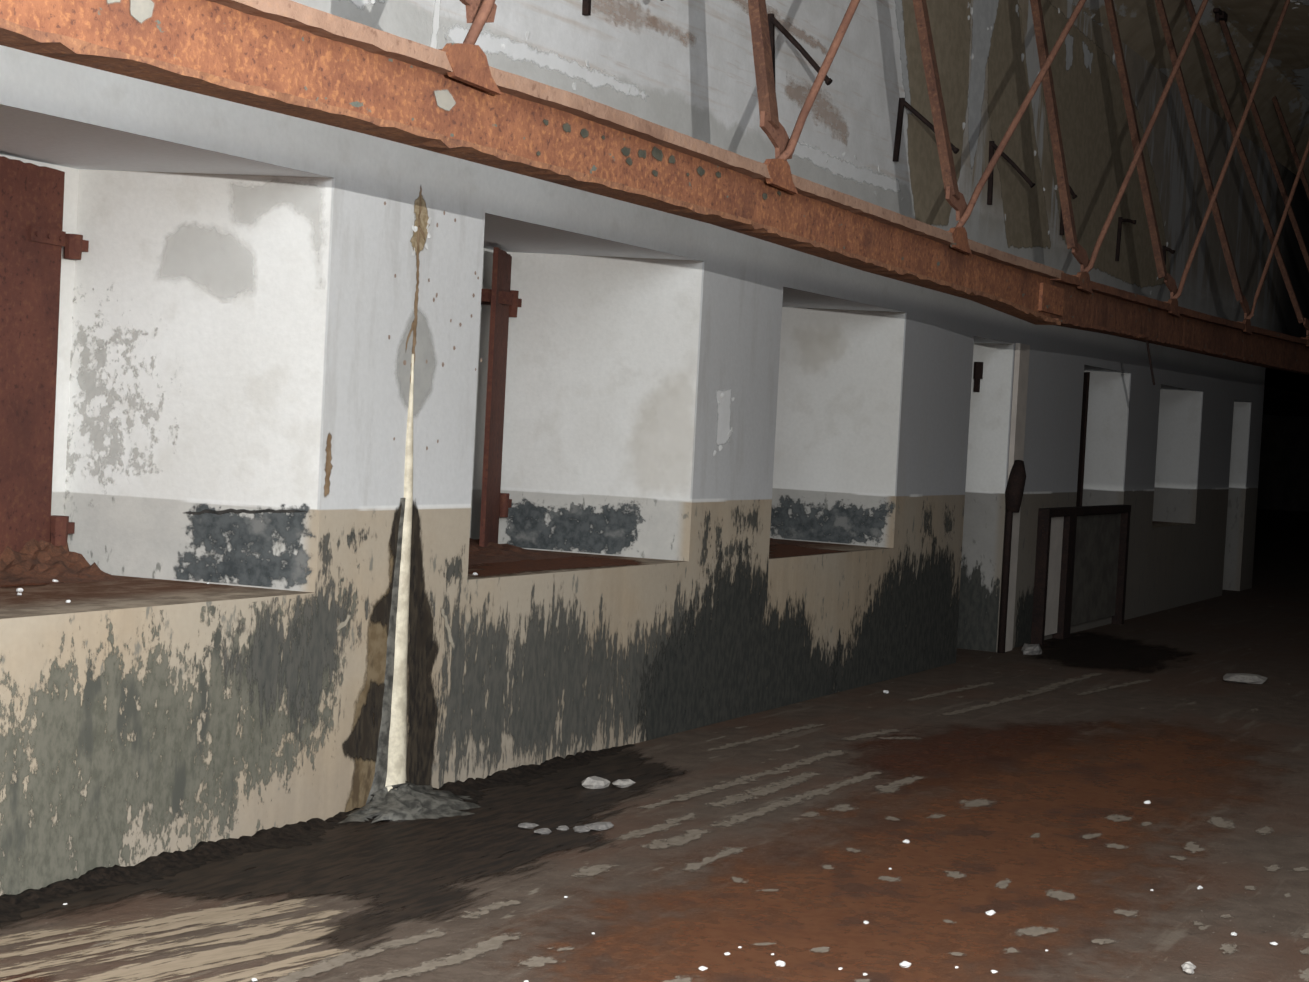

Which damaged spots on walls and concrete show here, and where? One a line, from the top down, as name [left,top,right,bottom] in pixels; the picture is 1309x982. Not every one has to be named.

peeling [788,0,1170,295]
leakage [0,311,1000,982]
leakage [906,589,1192,716]